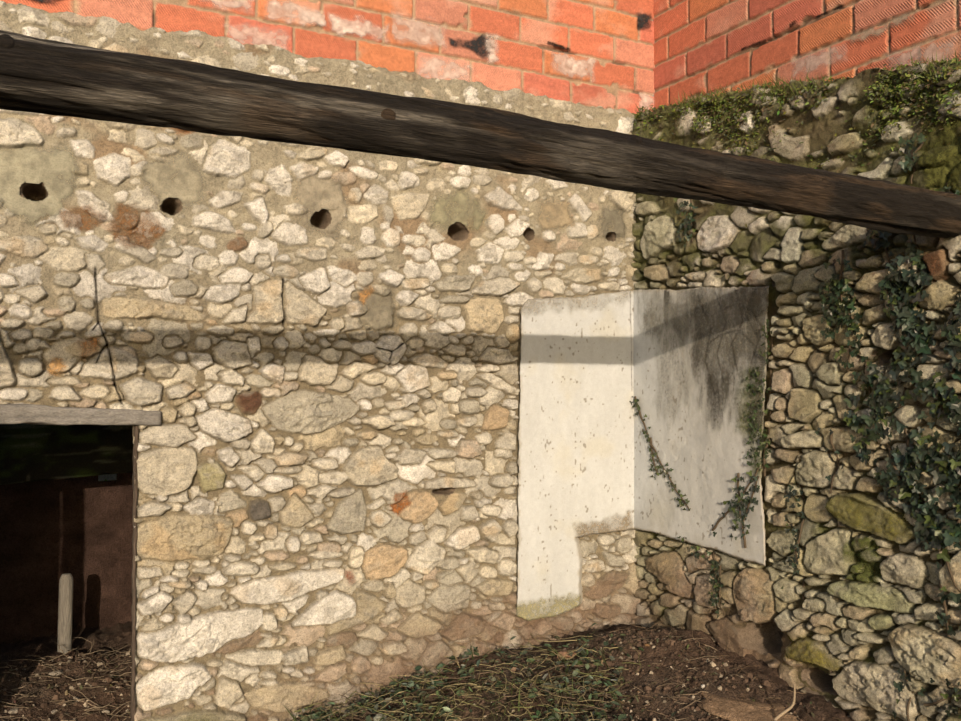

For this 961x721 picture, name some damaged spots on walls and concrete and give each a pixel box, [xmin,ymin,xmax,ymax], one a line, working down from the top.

crack [92,269,123,404]
water stain [644,286,768,423]